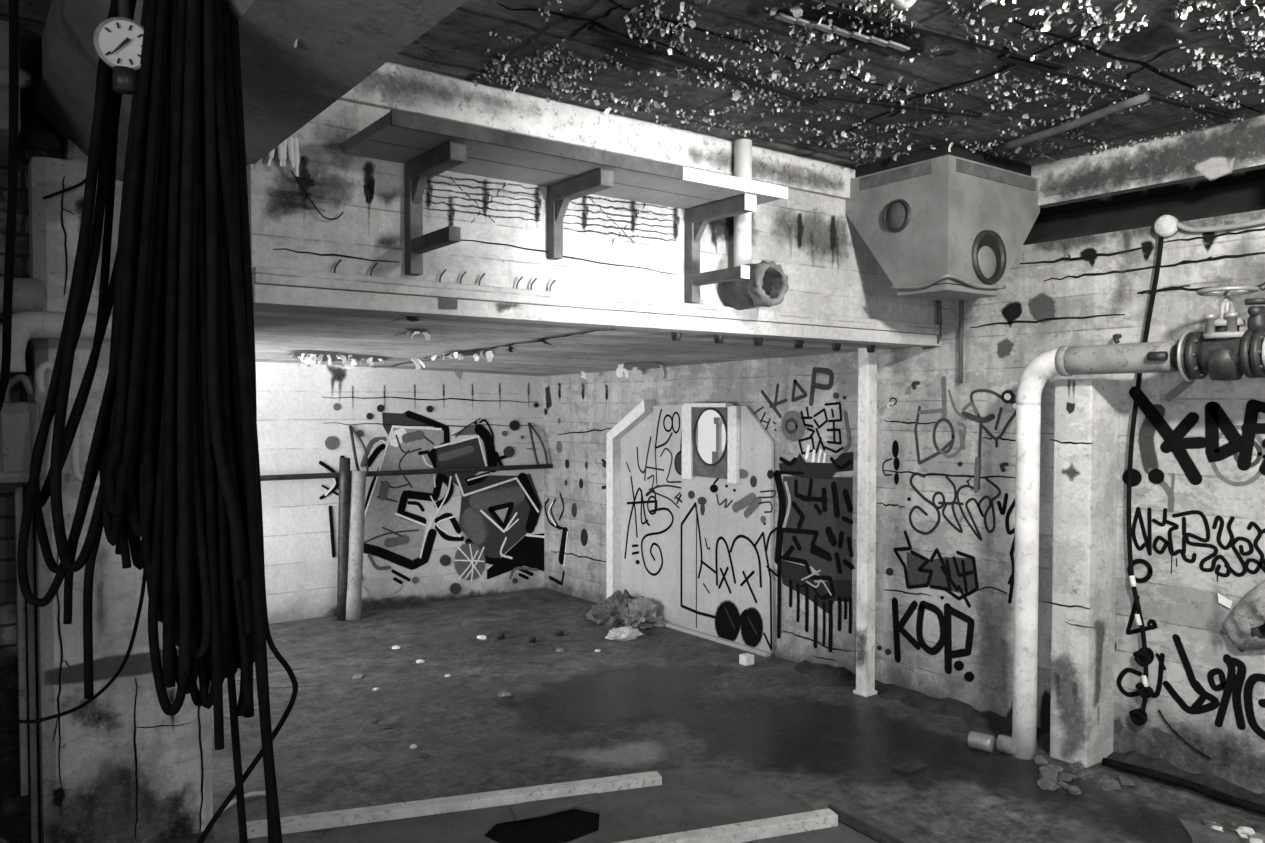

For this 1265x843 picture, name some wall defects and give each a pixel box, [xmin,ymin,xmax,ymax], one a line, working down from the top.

spalling [473,0,1265,168]
crack [496,0,1265,147]
crack [61,176,74,295]
crack [133,678,204,839]